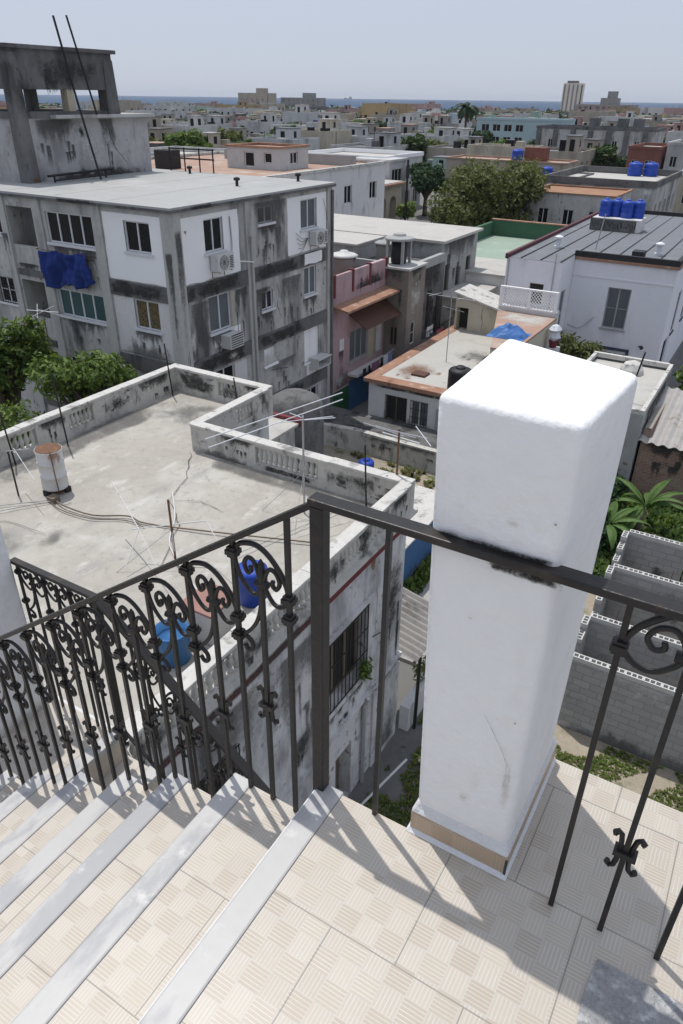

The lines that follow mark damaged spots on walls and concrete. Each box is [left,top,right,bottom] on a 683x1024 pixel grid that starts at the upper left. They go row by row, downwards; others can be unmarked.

damp [36,119,84,160]
damp [61,119,141,179]
damp [55,246,99,288]
damp [112,198,317,398]
damp [69,319,101,342]
crack [161,452,223,565]